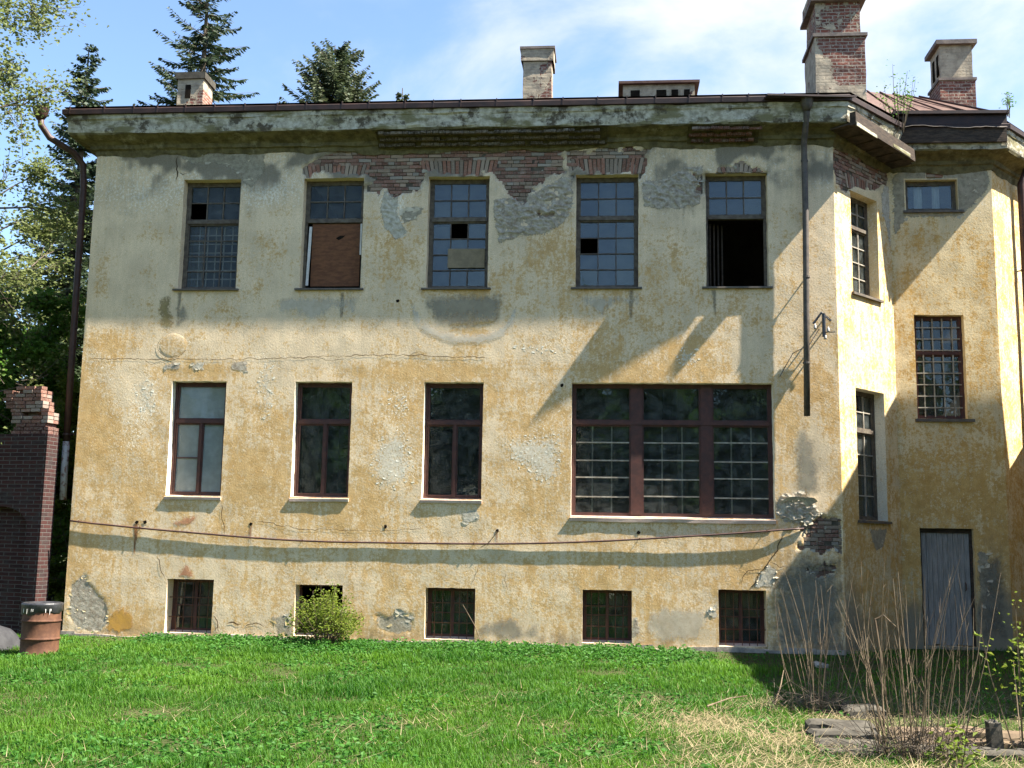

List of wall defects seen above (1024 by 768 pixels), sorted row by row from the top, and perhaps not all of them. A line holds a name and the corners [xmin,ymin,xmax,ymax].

flaking render [303,146,705,243]
peeling [833,149,990,246]
crack [96,352,485,365]
peeling [502,434,562,484]
crack [741,535,784,588]
flaking render [780,489,842,578]
spalling [67,575,133,632]
spalling [377,609,415,634]